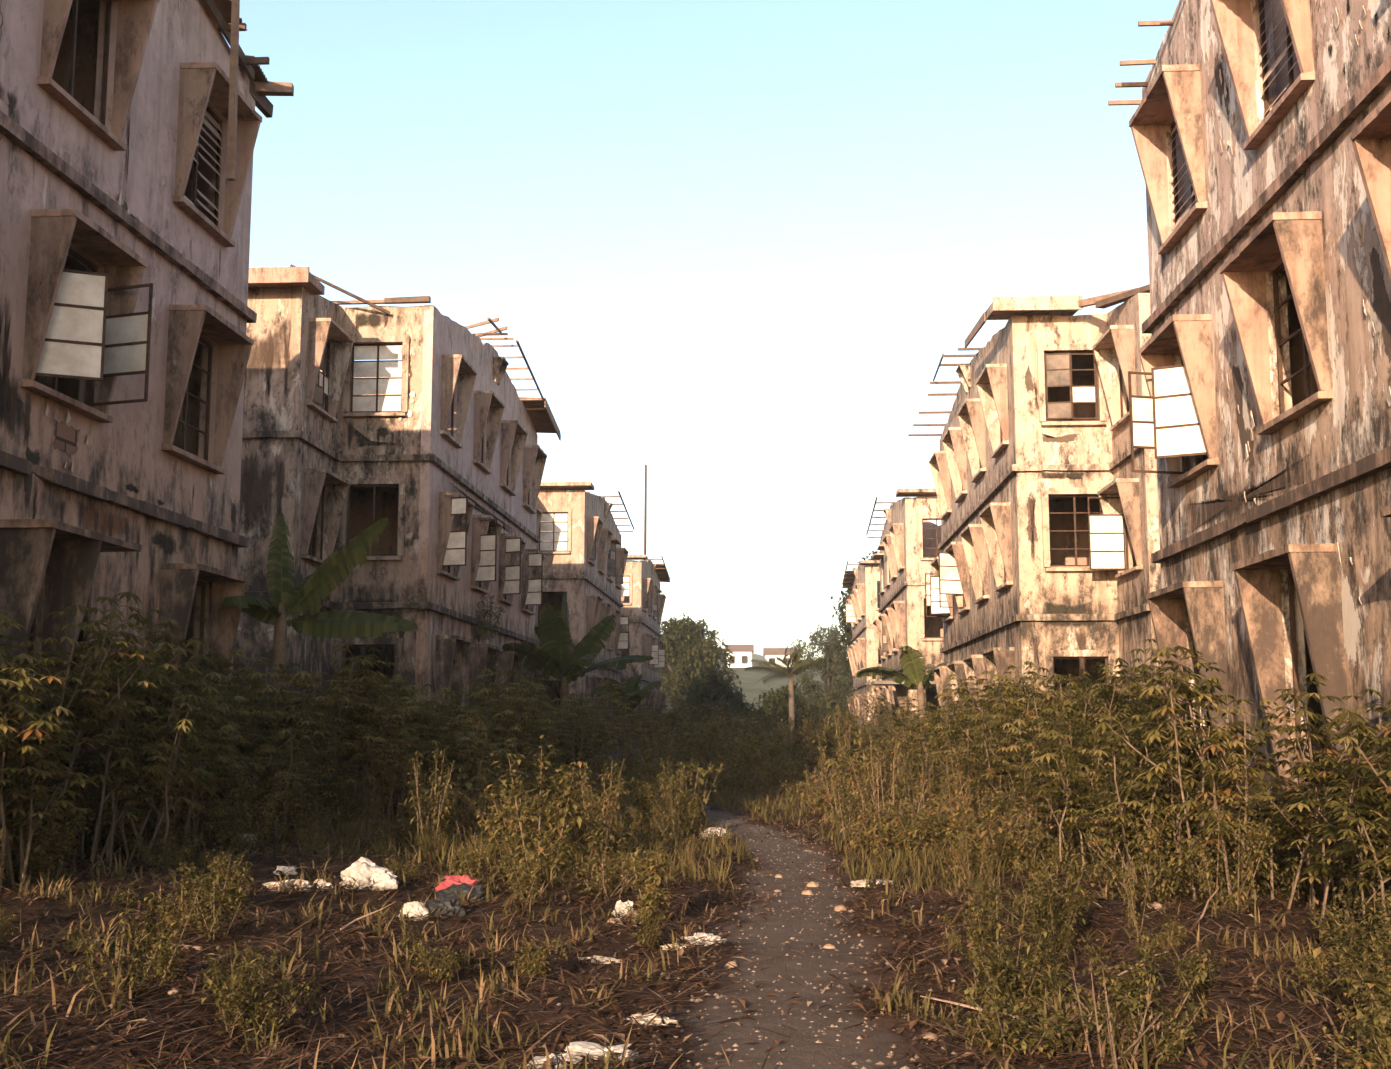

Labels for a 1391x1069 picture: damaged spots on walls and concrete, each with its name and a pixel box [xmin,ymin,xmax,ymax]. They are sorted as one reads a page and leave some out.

water stain [0,316,40,519]
water stain [244,323,290,397]